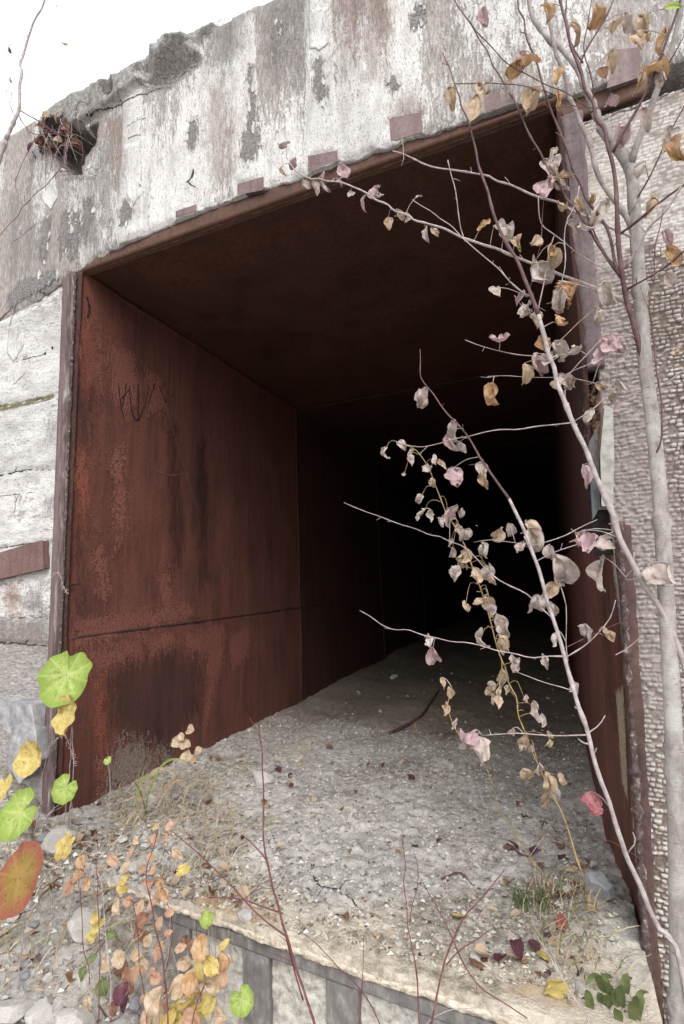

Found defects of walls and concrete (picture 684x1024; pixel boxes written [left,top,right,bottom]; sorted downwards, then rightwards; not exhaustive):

crack [86,87,162,125]
spalling [128,31,199,91]
spalling [6,115,99,312]
rust [72,441,96,535]
rust [90,673,113,802]